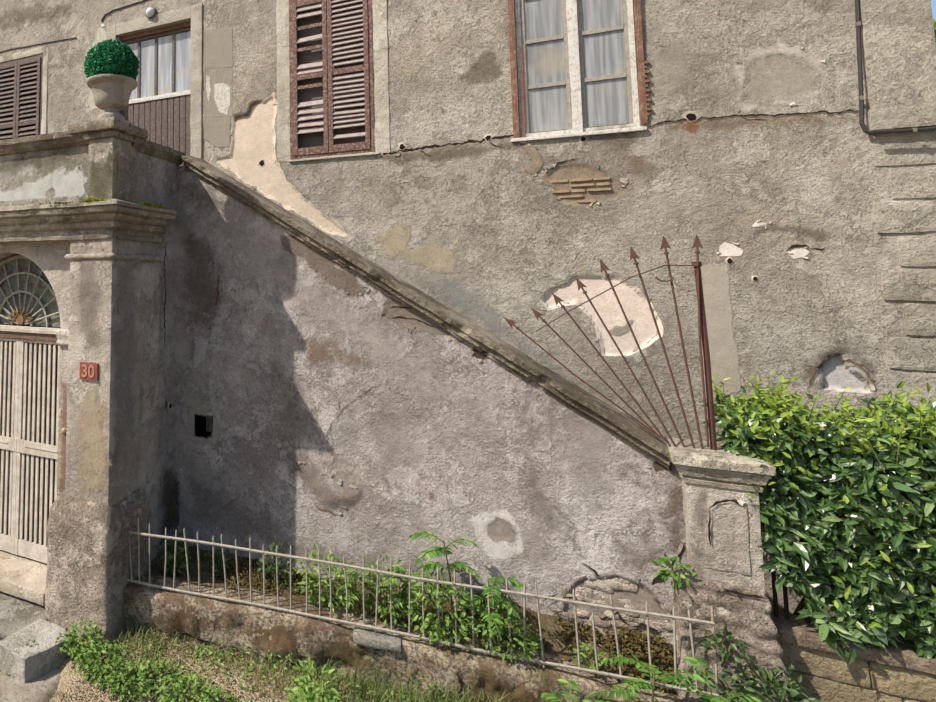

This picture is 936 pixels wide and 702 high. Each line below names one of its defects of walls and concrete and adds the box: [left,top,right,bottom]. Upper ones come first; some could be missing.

crack [647,109,865,129]
spalling [204,67,348,237]
crack [377,135,522,157]
spalling [520,141,629,208]
spalling [282,236,370,296]
spalling [716,241,743,265]
spalling [786,247,809,259]
spalling [540,275,664,357]
crack [708,499,747,546]
crack [648,543,684,584]